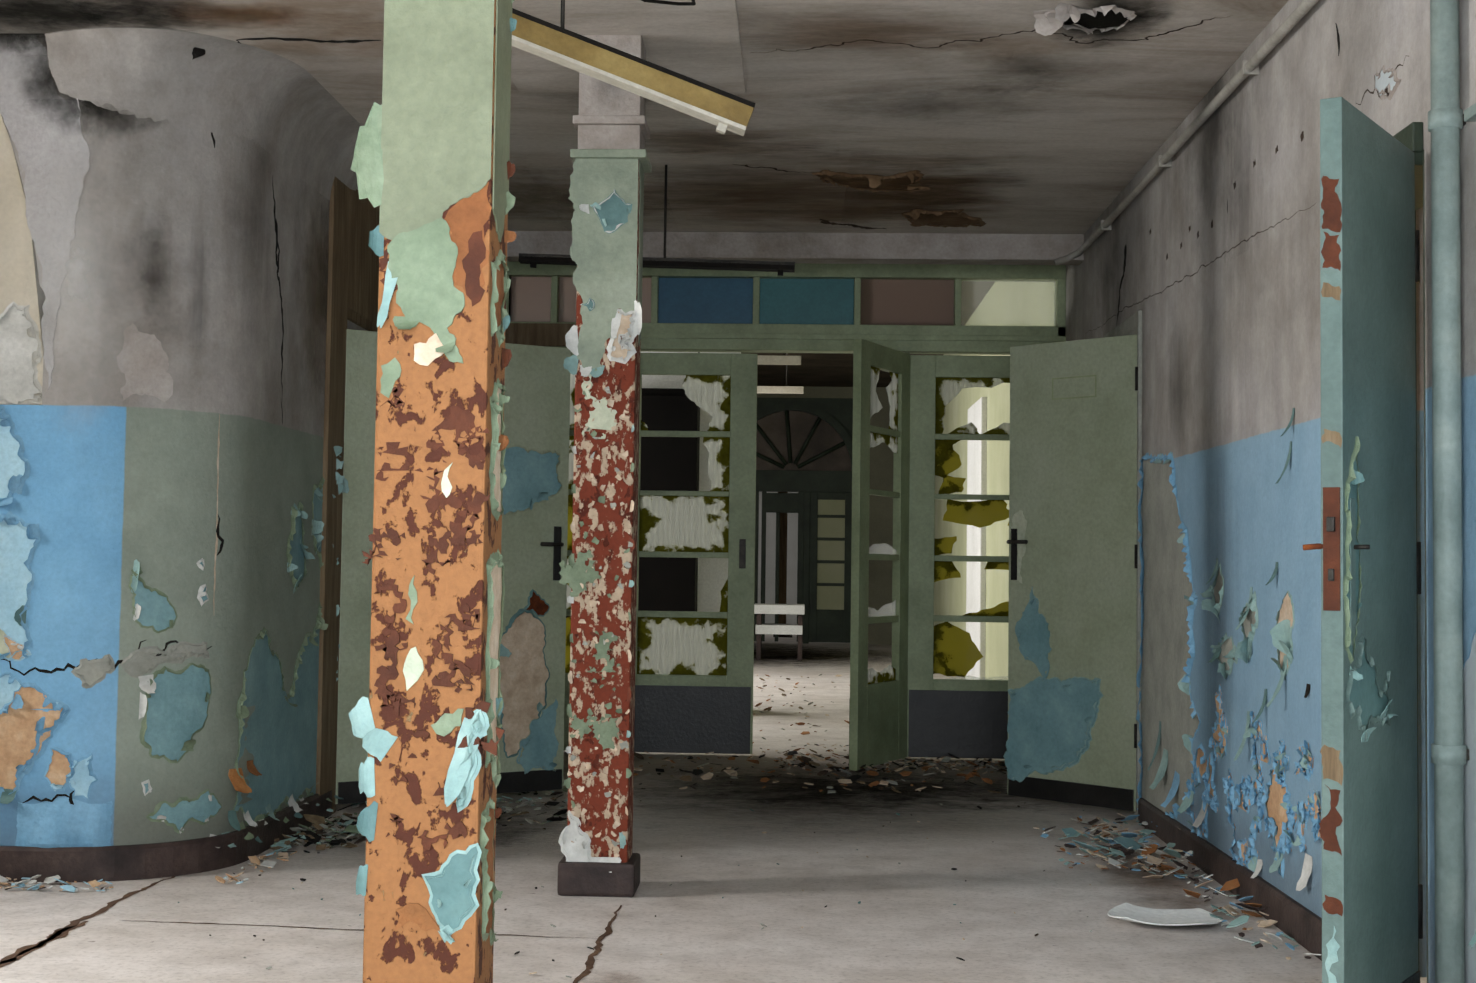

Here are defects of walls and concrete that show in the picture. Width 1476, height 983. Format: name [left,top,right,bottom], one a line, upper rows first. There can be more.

peeling [1033,2,1137,36]
peeling [351,102,456,408]
peeling [0,36,98,804]
peeling [71,558,212,763]
crack [0,876,364,967]
peeling [141,601,343,848]
peeling [349,161,642,946]
crack [495,905,622,983]
peeling [1136,451,1343,891]
peeling [1275,408,1295,484]
peeling [1322,895,1343,983]
peeling [1463,630,1476,983]